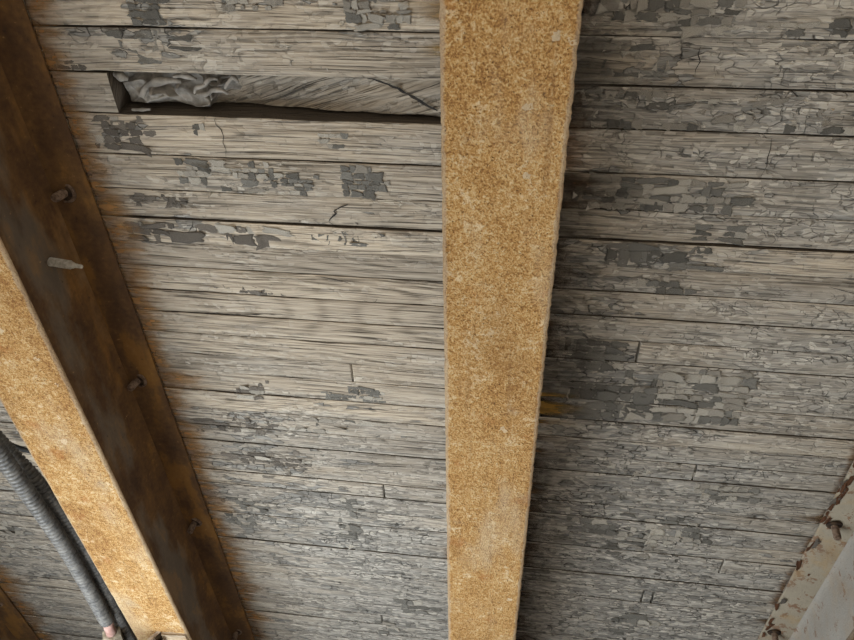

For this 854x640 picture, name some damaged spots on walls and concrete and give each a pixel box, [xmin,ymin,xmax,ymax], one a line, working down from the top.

peeling [756,18,854,39]
crack [329,46,429,59]
crack [367,78,441,114]
peeling [570,42,789,132]
peeling [91,115,156,157]
peeling [783,108,854,135]
peeling [571,172,756,295]
peeling [558,338,760,426]
peeling [606,460,762,504]
peeling [819,463,854,525]
peeling [555,511,722,559]
peeling [796,539,821,576]